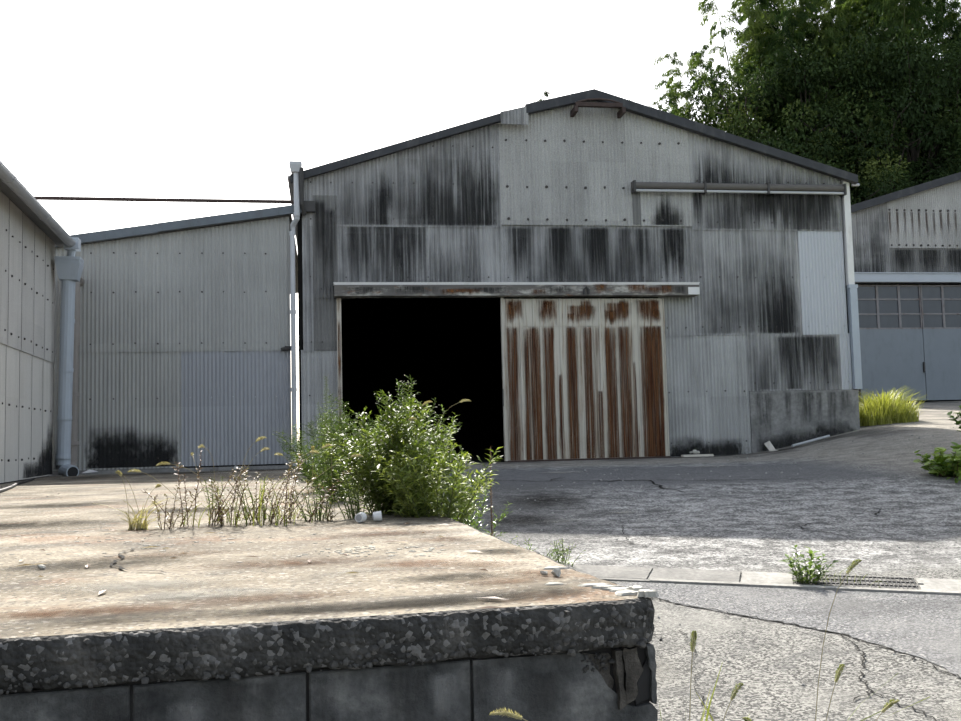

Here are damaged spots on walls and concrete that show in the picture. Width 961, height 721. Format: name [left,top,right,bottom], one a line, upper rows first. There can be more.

water stain [347,173,494,292]
water stain [512,228,529,268]
water stain [657,207,683,263]
water stain [744,181,831,229]
water stain [763,281,834,388]
rust [507,285,671,460]
water stain [24,437,196,479]
crack [24,520,316,573]
crack [621,525,705,553]
spalling [577,583,659,614]
spalling [259,610,662,710]
crack [651,597,959,721]